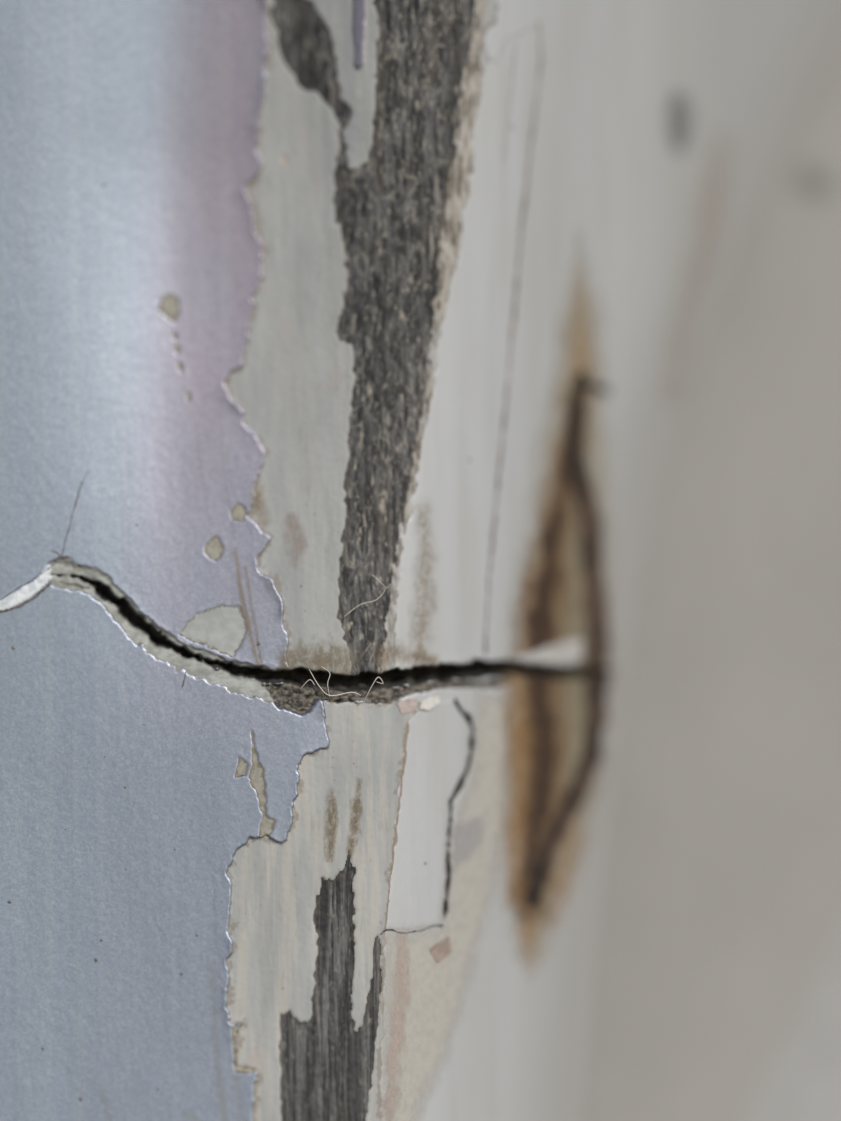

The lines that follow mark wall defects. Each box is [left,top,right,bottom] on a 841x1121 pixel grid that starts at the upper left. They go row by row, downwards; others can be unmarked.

peeling [225,0,379,676]
crack [0,22,612,935]
peeling [226,700,421,1121]
peeling [378,0,499,675]
peeling [429,936,451,964]
rust [512,305,599,941]